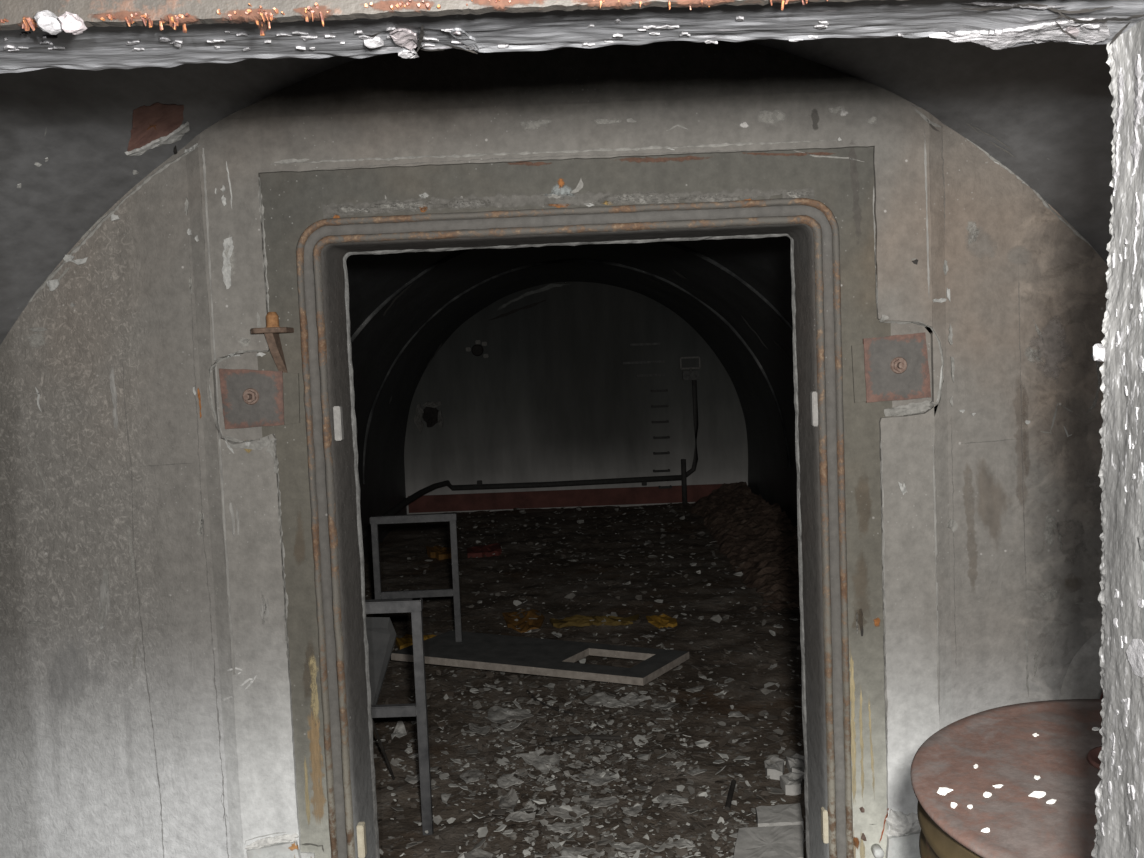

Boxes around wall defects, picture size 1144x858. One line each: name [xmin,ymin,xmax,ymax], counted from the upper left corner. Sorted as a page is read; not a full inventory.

peeling [0,17,65,51]
peeling [130,13,190,48]
spalling [207,2,479,58]
peeling [637,25,690,36]
peeling [789,21,829,42]
spalling [929,18,1110,50]
peeling [125,102,271,675]
rust [309,660,318,718]
rust [850,658,874,813]
rust [853,808,889,858]